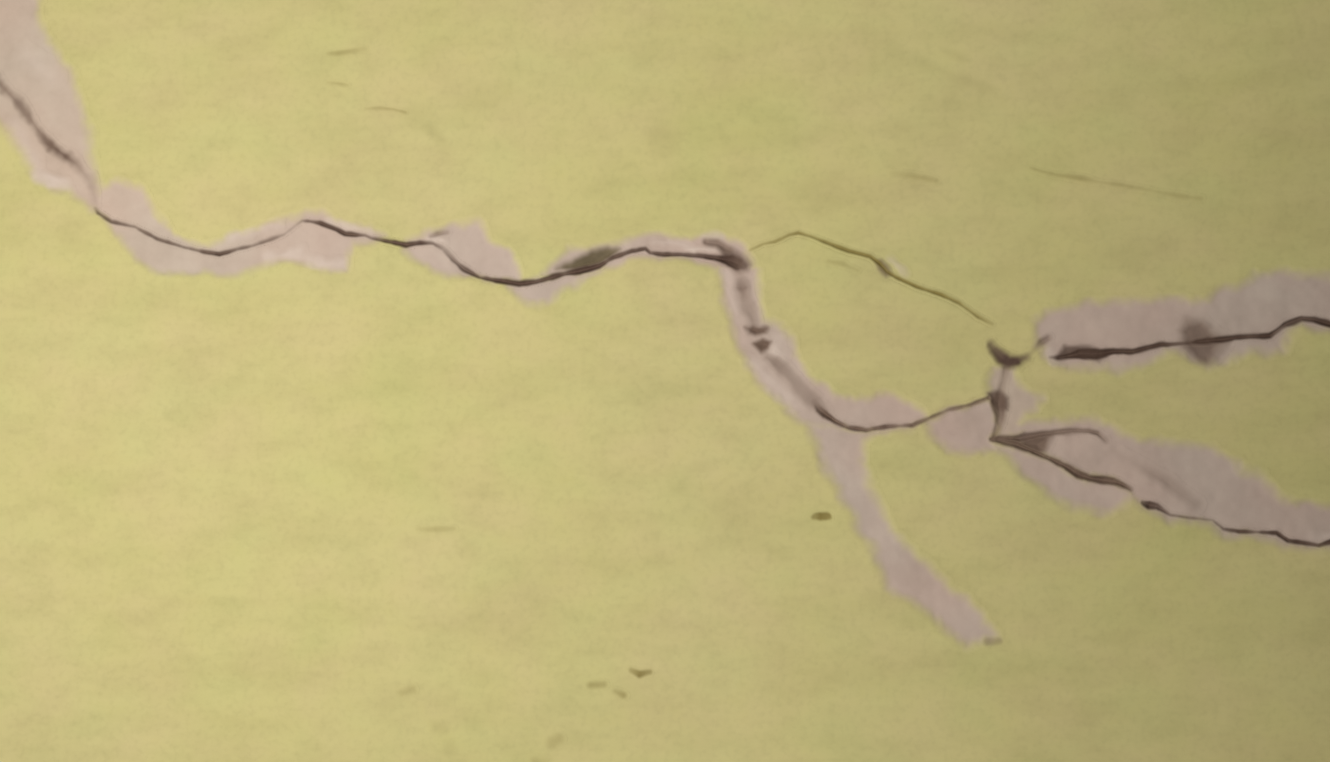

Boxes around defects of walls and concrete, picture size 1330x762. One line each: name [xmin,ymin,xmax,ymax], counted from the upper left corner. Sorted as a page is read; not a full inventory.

peeling [0,0,391,282]
crack [0,70,1330,550]
peeling [398,213,1330,656]